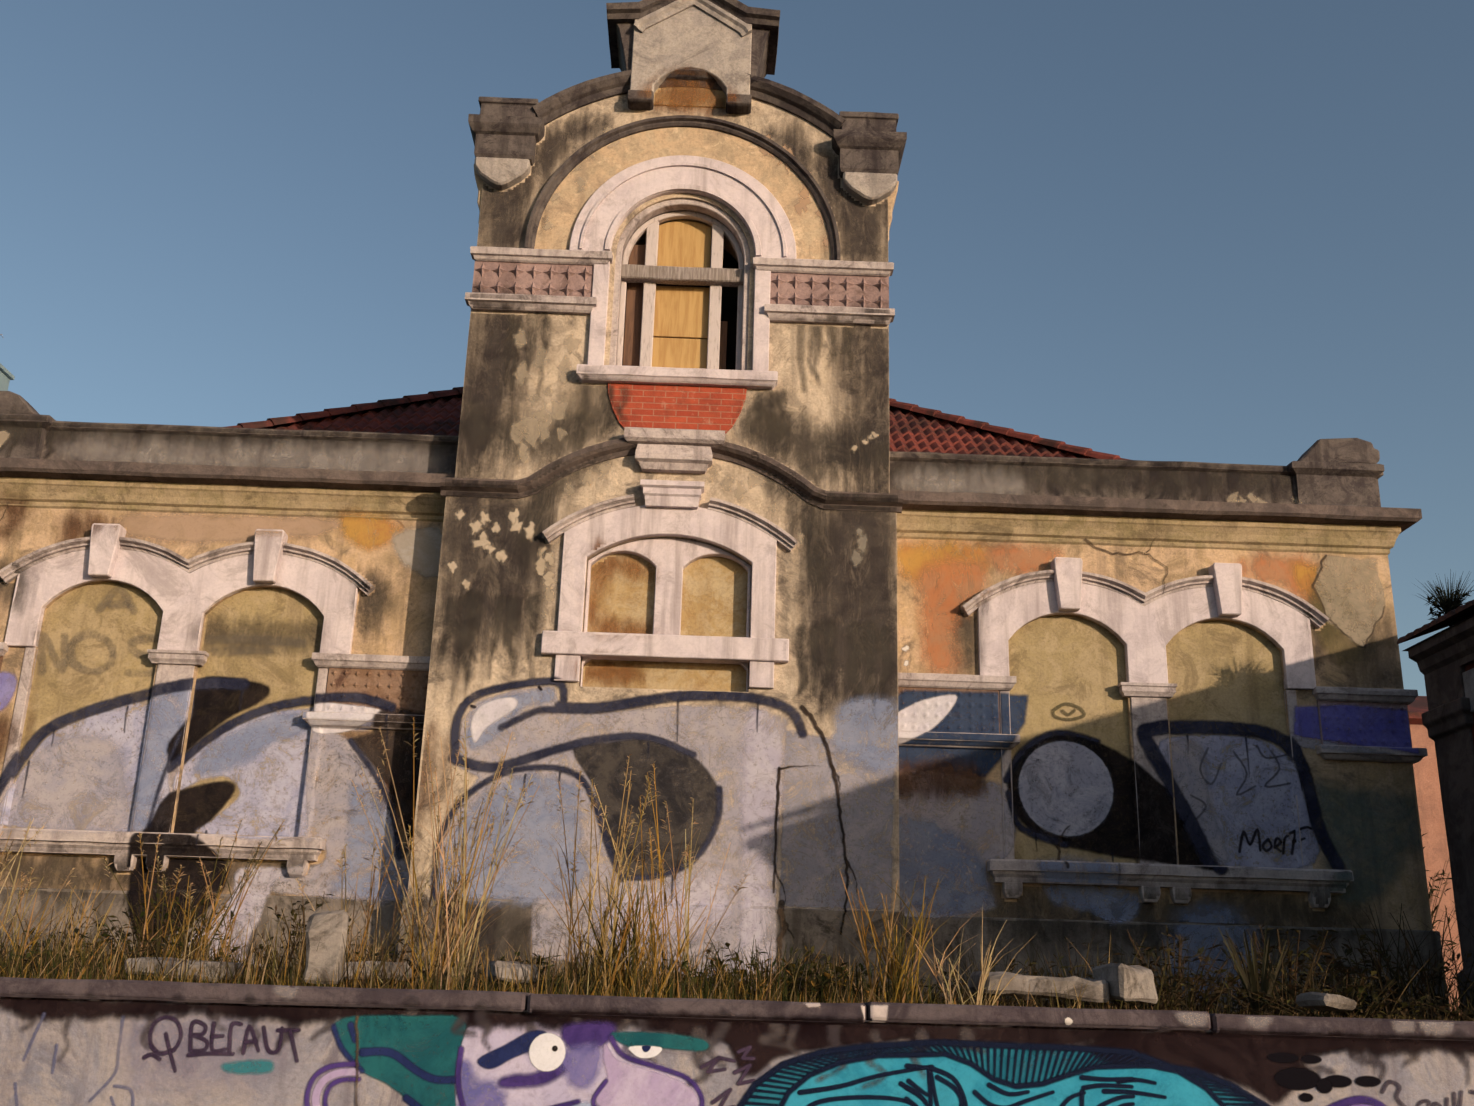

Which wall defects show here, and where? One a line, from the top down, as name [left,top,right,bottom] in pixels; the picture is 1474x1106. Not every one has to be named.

peeling [342,515,470,590]
flaking render [455,509,555,587]
water stain [435,295,636,684]
water stain [708,308,898,719]
crack [773,705,857,978]